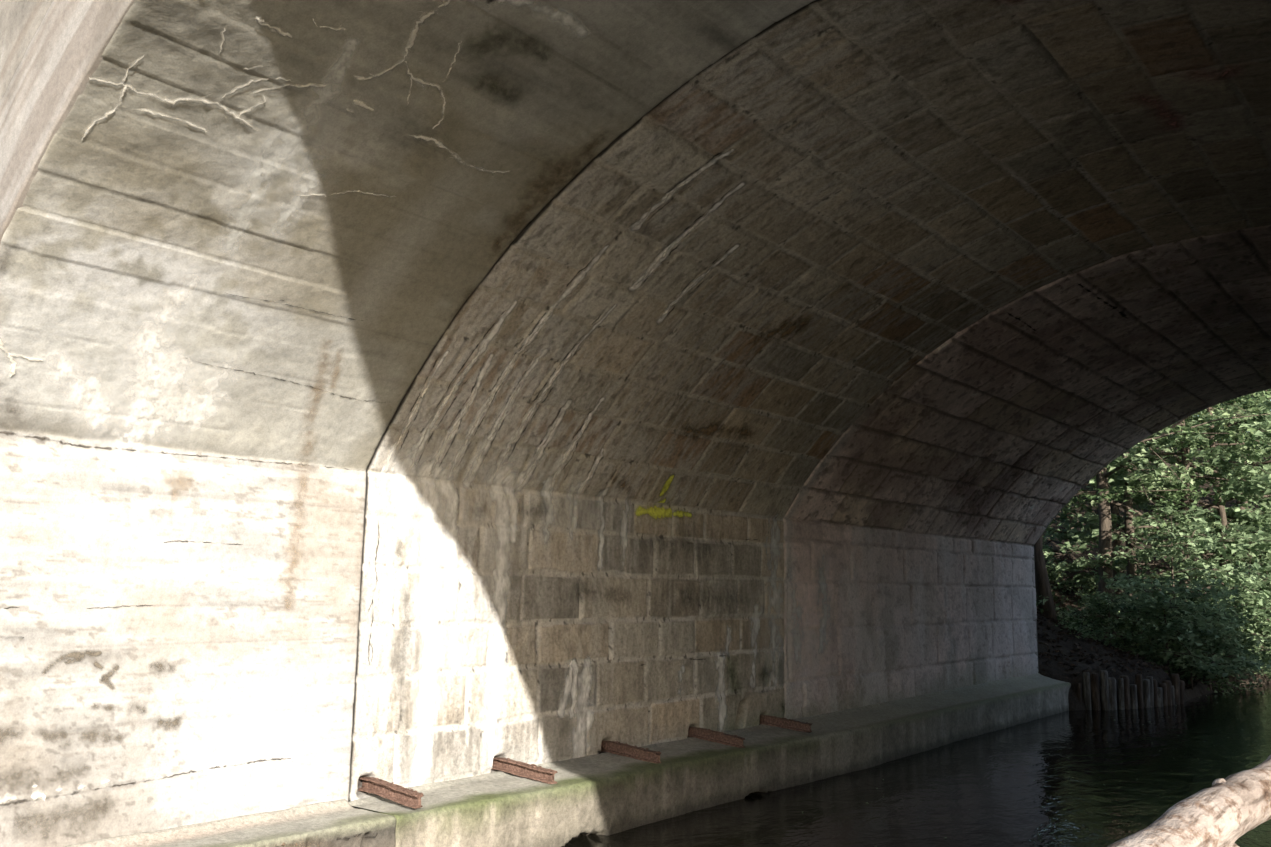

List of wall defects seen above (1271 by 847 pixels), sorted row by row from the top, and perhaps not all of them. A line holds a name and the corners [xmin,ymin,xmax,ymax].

crack [0,340,43,377]
leakage [54,278,230,450]
leakage [227,40,357,249]
crack [82,0,510,173]
leakage [633,150,734,230]
leakage [630,183,744,290]
leakage [657,245,739,323]
leakage [381,245,616,786]